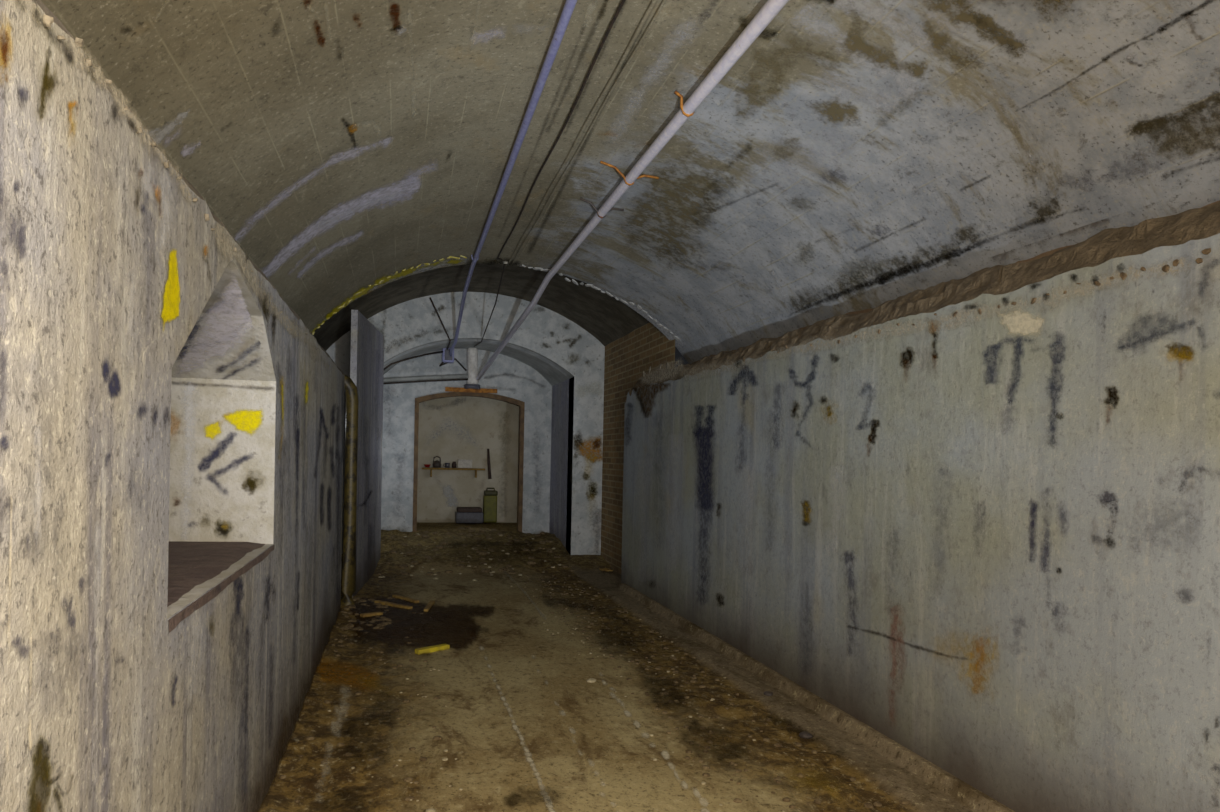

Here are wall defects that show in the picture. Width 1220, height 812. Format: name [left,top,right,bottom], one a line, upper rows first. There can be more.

corrosion [390,4,401,32]